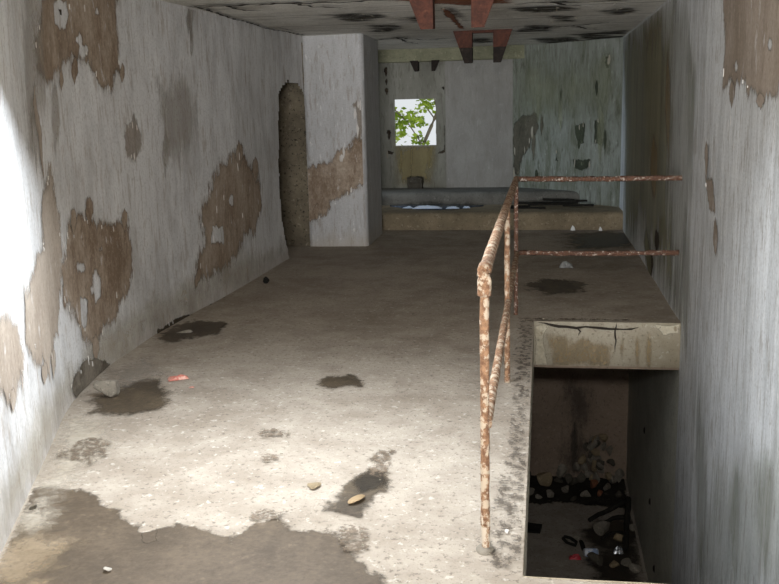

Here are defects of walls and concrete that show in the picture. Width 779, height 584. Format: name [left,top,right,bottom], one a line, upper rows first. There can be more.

peeling [35,0,125,93]
peeling [723,0,779,109]
peeling [307,100,363,222]
peeling [0,86,133,412]
leakage [159,320,227,342]
peeling [194,141,262,289]
leakage [318,374,364,388]
leakage [526,279,588,294]
rust [550,338,608,366]
crack [539,322,638,347]
leakage [0,378,390,584]